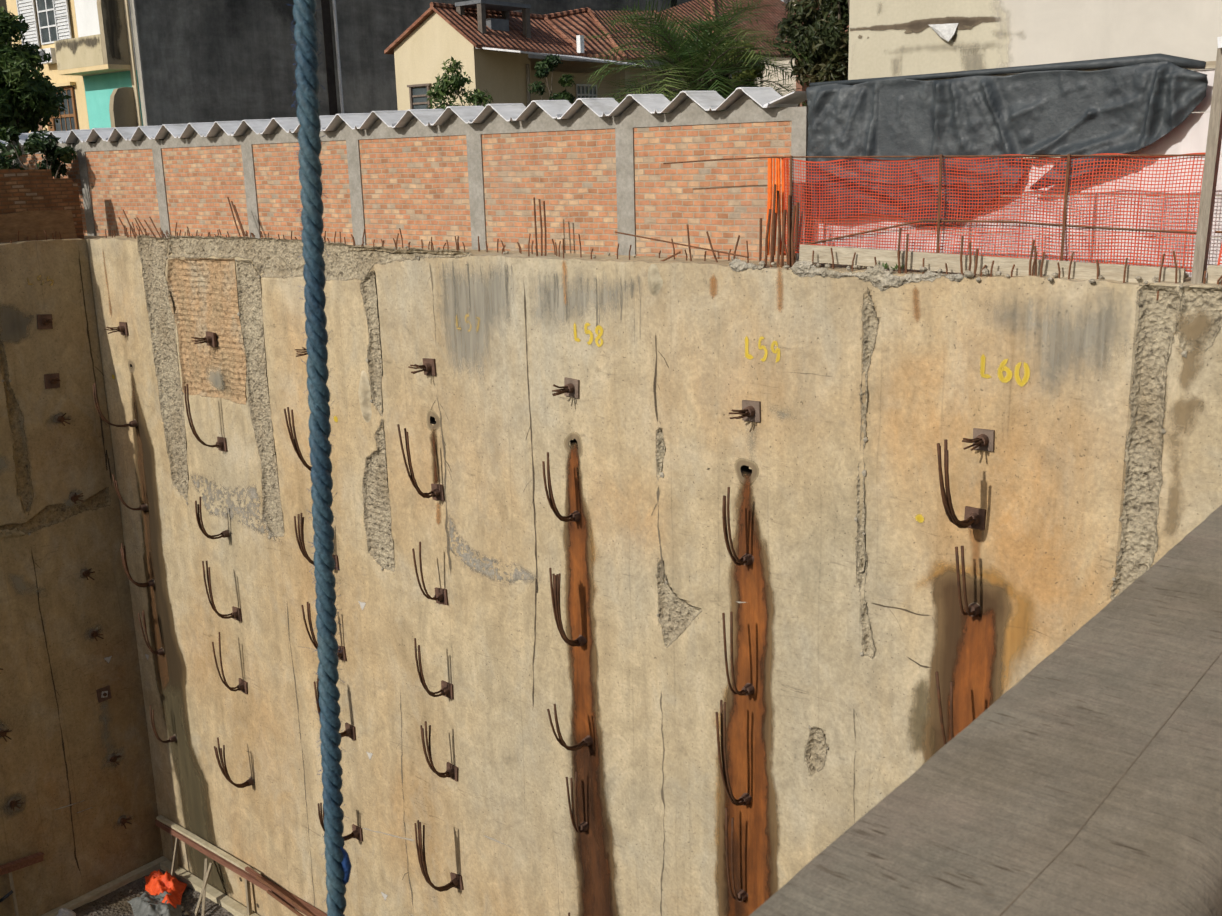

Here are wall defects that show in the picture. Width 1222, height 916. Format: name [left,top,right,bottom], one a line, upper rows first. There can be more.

spalling [0,341,110,536]
spalling [105,197,305,539]
spalling [322,197,564,571]
spalling [615,184,994,658]
spalling [1010,240,1074,279]
spalling [1110,251,1222,600]
rust [563,445,619,916]
rust [716,475,779,916]
spalling [805,725,829,775]
rust [910,529,1031,762]